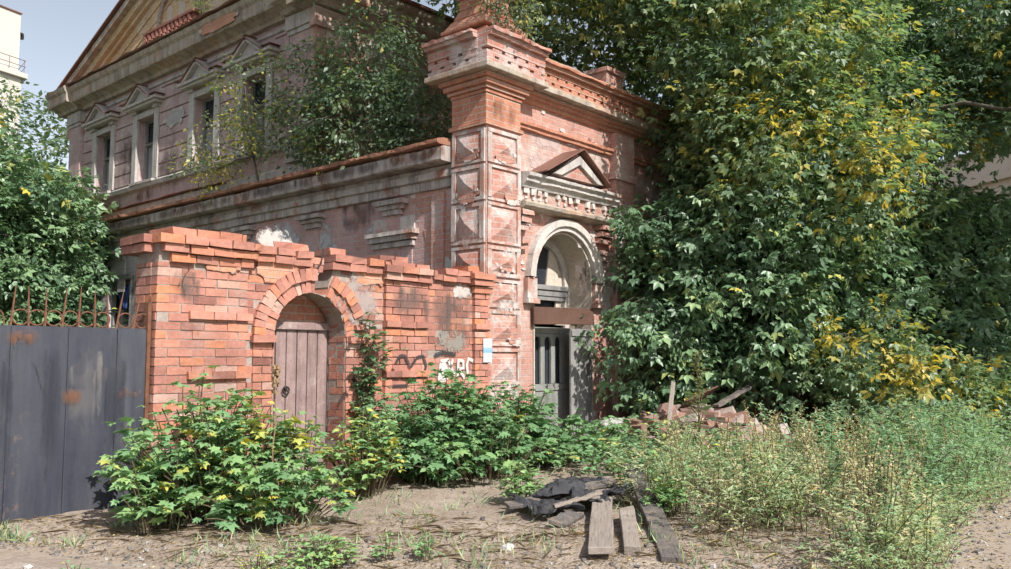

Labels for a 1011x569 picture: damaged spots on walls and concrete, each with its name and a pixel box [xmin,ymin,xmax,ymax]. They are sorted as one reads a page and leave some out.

spalling [257,256,299,283]
crack [313,238,328,270]